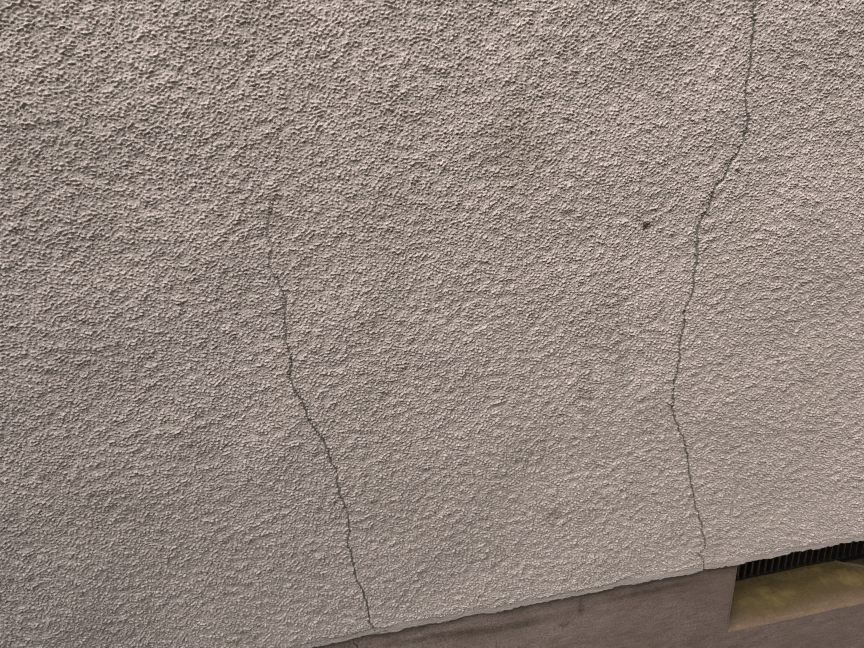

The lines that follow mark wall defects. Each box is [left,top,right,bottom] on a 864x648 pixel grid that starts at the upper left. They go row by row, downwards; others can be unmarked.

crack [238,263,375,631]
crack [671,0,758,569]